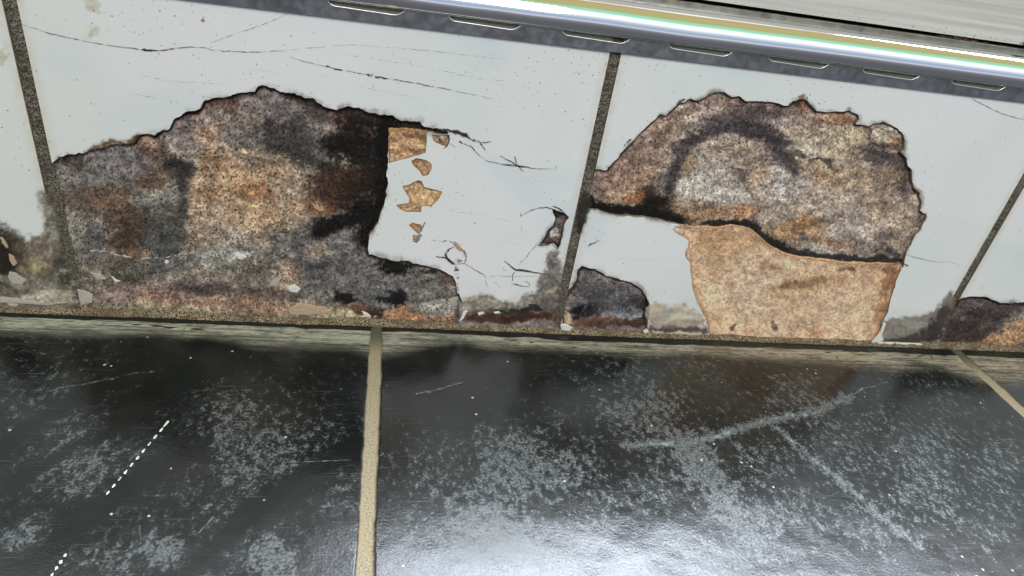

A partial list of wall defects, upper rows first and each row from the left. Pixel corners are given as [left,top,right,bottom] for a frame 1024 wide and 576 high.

crack [31,19,276,97]
crack [270,45,500,99]
spalling [54,85,491,322]
crack [444,136,557,171]
spalling [589,90,925,266]
crack [434,240,550,289]
spalling [560,266,649,334]
spalling [939,296,1024,346]